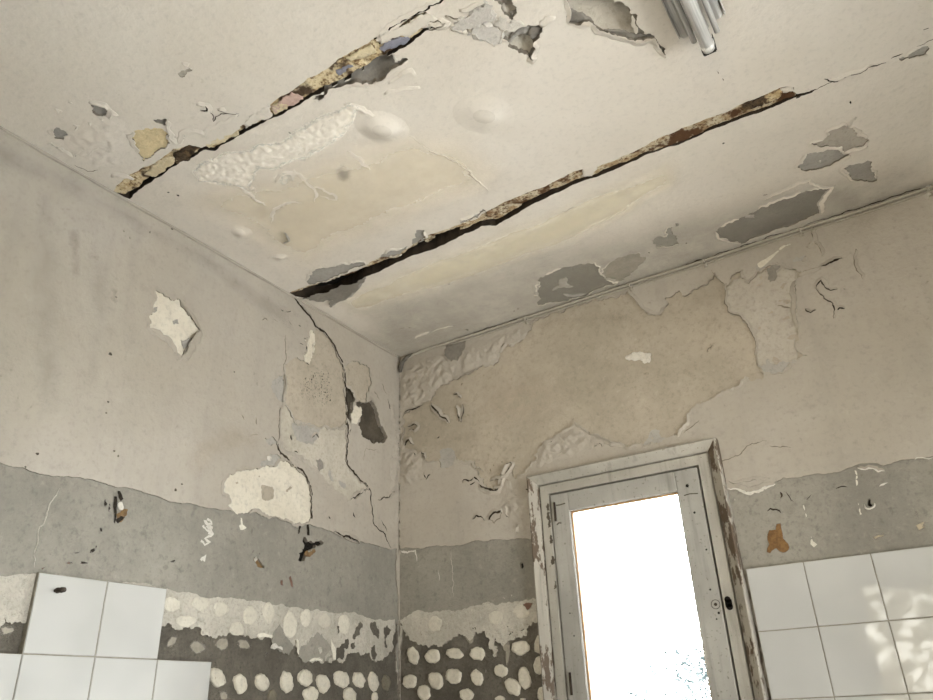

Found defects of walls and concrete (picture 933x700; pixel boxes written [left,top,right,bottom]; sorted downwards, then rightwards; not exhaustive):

crack [374,0,496,47]
flaking render [451,0,541,65]
crack [166,102,239,146]
peeling [793,117,878,182]
peeling [378,230,435,259]
peeling [714,185,836,245]
peeling [147,288,203,362]
peeling [400,223,806,490]
peeling [221,327,384,512]
crack [263,298,399,546]
rust [767,523,789,553]
peeling [270,621,391,663]